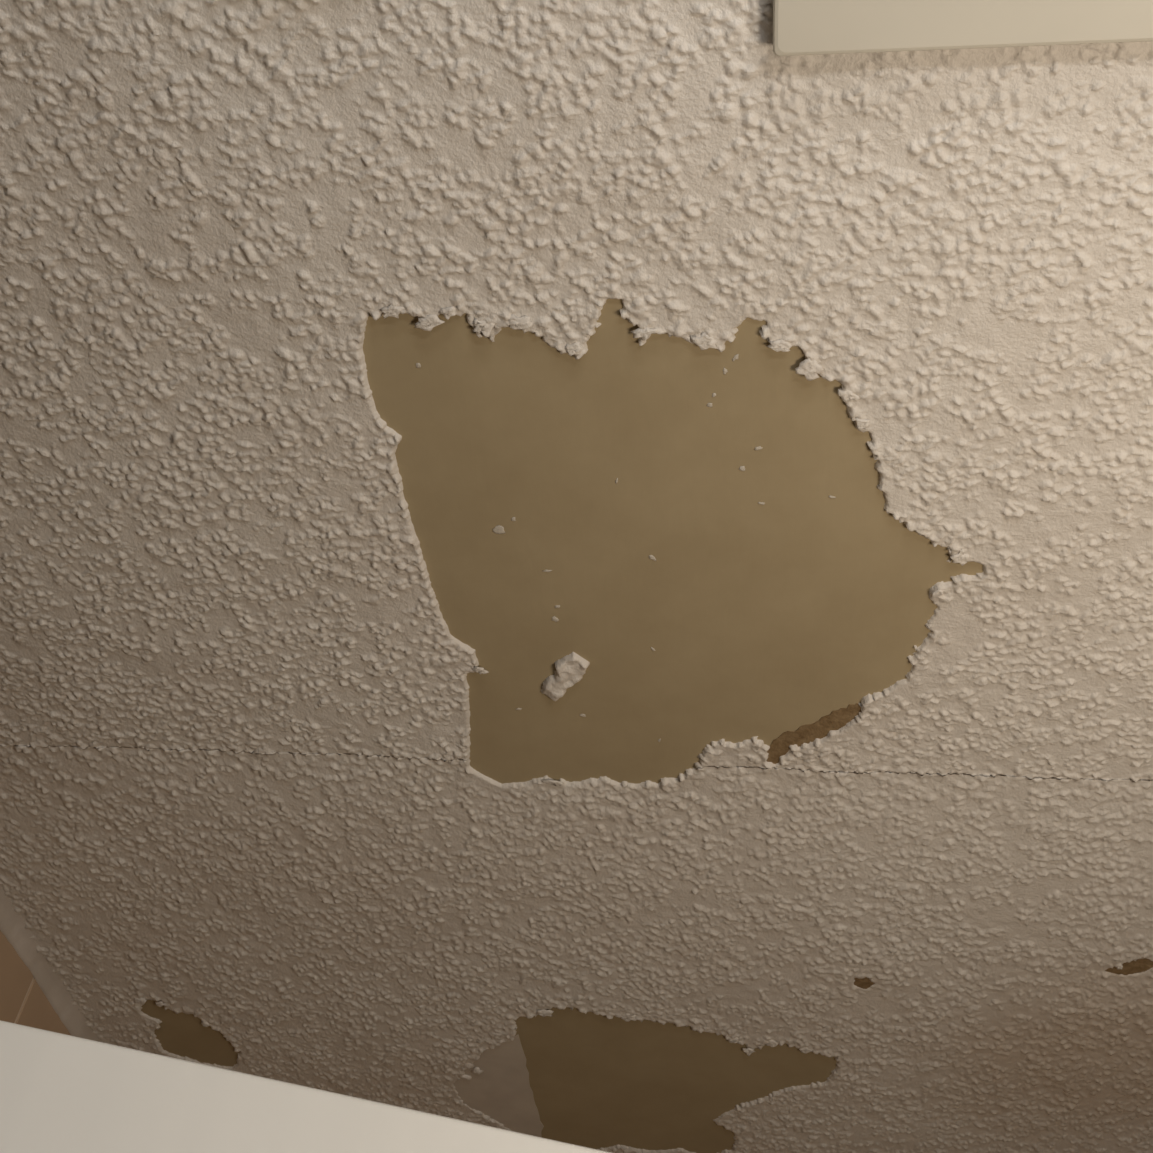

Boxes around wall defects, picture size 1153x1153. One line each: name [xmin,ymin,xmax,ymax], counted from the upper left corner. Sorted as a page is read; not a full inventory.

peeling [363,298,983,786]
peeling [134,998,241,1067]
peeling [453,1007,837,1153]
peeling [1105,958,1153,975]